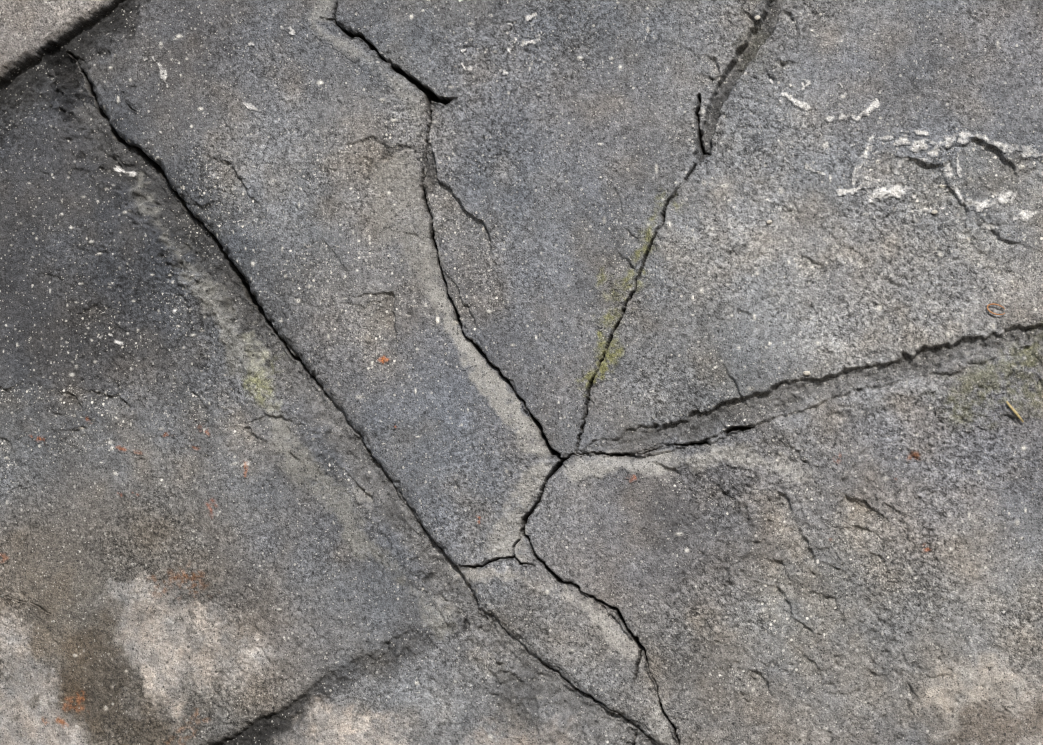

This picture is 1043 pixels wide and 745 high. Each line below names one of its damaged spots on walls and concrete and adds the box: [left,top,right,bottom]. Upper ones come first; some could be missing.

crack [65,50,328,396]
crack [304,0,757,745]
crack [0,594,51,615]